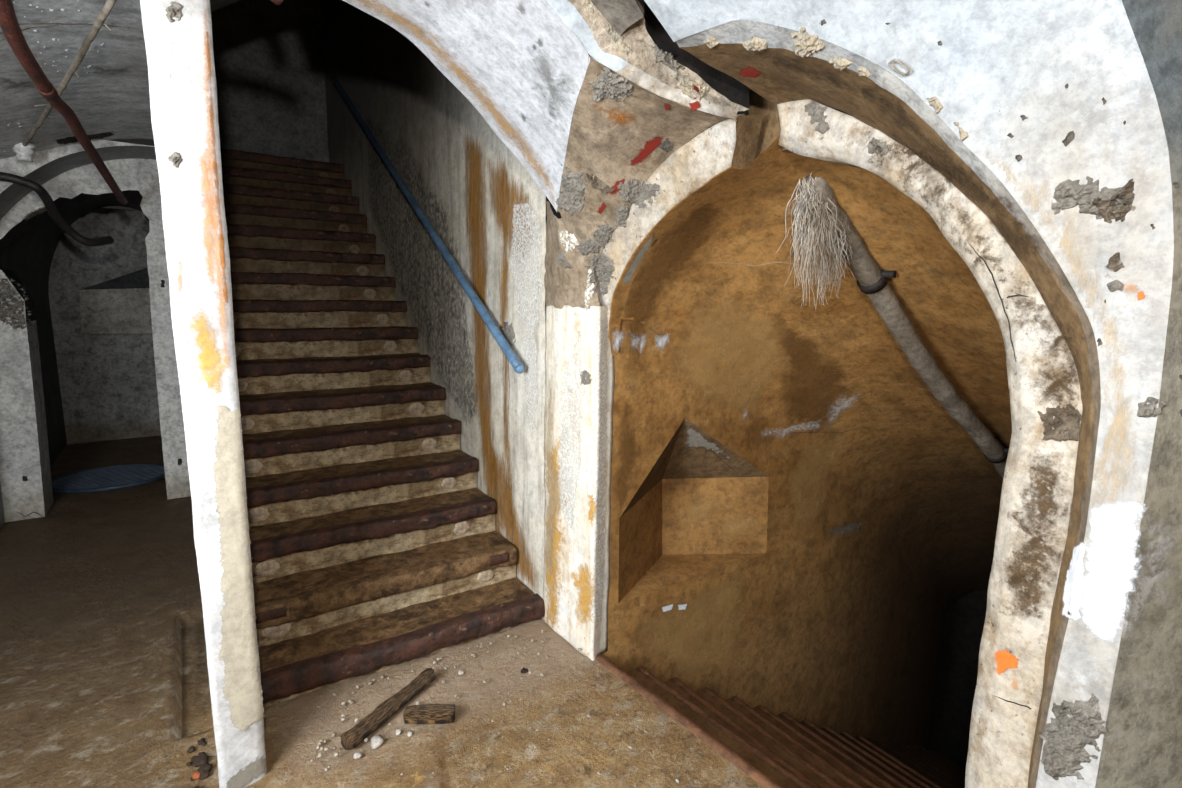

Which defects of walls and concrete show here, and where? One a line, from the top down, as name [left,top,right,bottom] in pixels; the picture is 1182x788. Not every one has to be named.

spalling [588,67,633,104]
corrosion [201,32,228,328]
spalling [555,164,661,216]
spalling [1051,176,1136,223]
peeling [558,231,579,253]
peeling [584,269,594,311]
corrosion [466,142,532,534]
spalling [1037,405,1082,442]
spalling [1137,397,1166,418]
corrosion [588,495,597,520]
corrosion [545,443,595,625]
spalling [1039,693,1107,780]